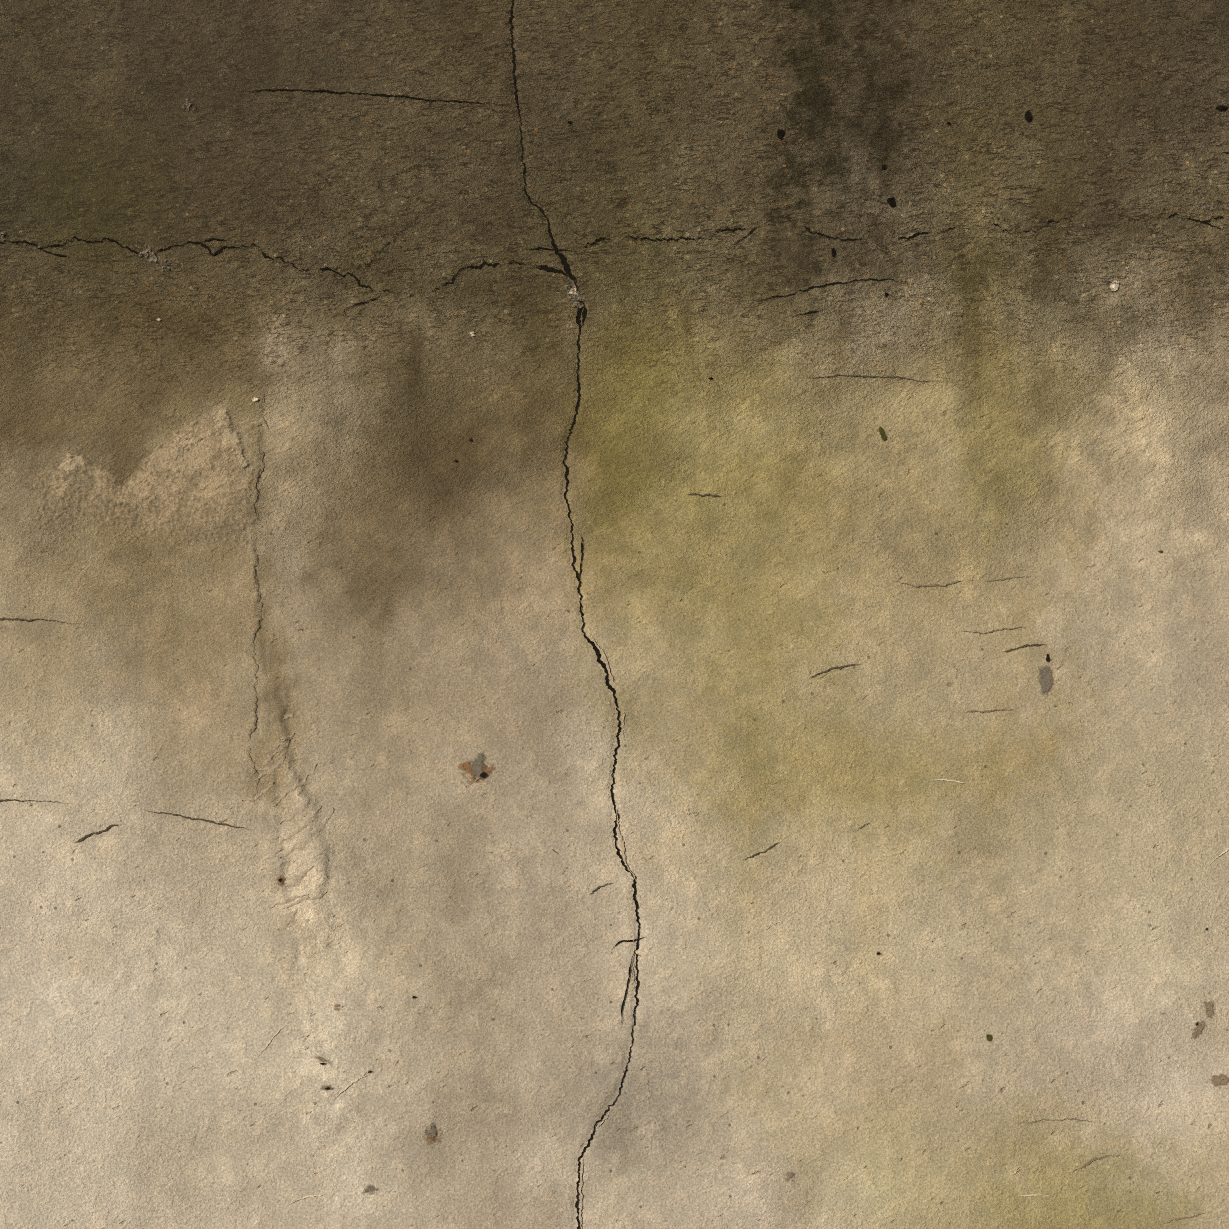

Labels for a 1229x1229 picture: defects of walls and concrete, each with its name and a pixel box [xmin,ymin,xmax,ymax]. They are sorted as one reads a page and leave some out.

crack [992,215,1072,232]
crack [1129,213,1224,230]
crack [804,226,862,241]
crack [897,227,955,239]
crack [0,236,390,313]
crack [752,278,907,317]
crack [247,0,757,1229]